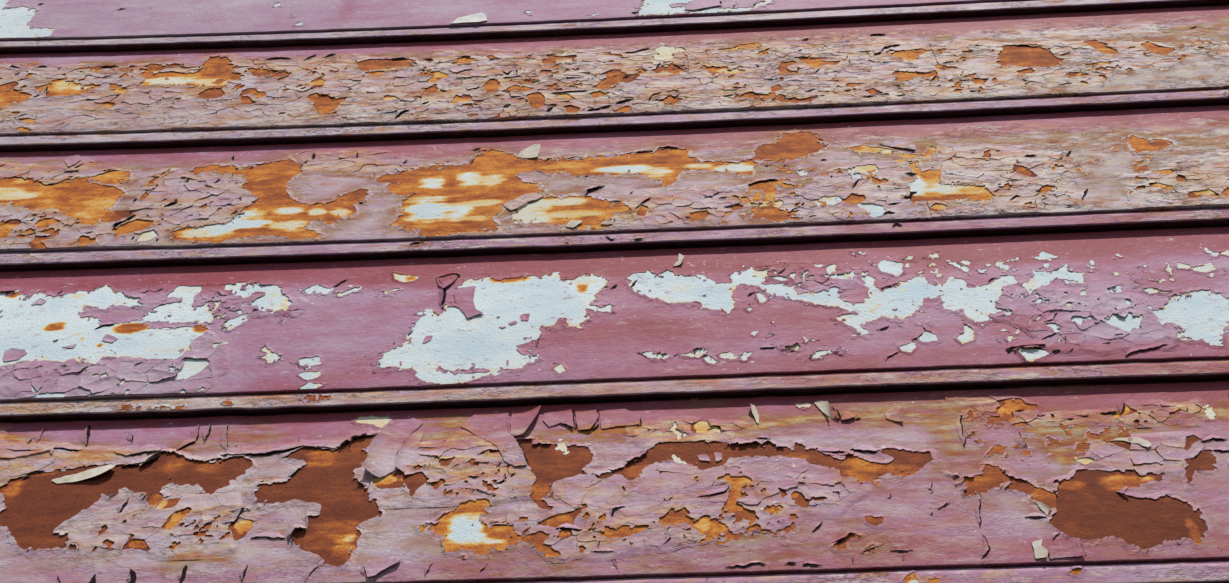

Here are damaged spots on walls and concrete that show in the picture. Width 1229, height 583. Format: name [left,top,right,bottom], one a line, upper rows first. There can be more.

corrosion [0,56,351,117]
corrosion [636,56,818,103]
corrosion [896,18,1229,93]
corrosion [0,128,1012,247]
peeling [770,139,1086,223]
peeling [1118,149,1229,208]
peeling [0,246,1229,398]
peeling [943,390,1218,477]
peeling [66,493,261,561]
corrosion [0,430,386,576]
peeling [350,400,873,563]
corrosion [402,400,1229,565]